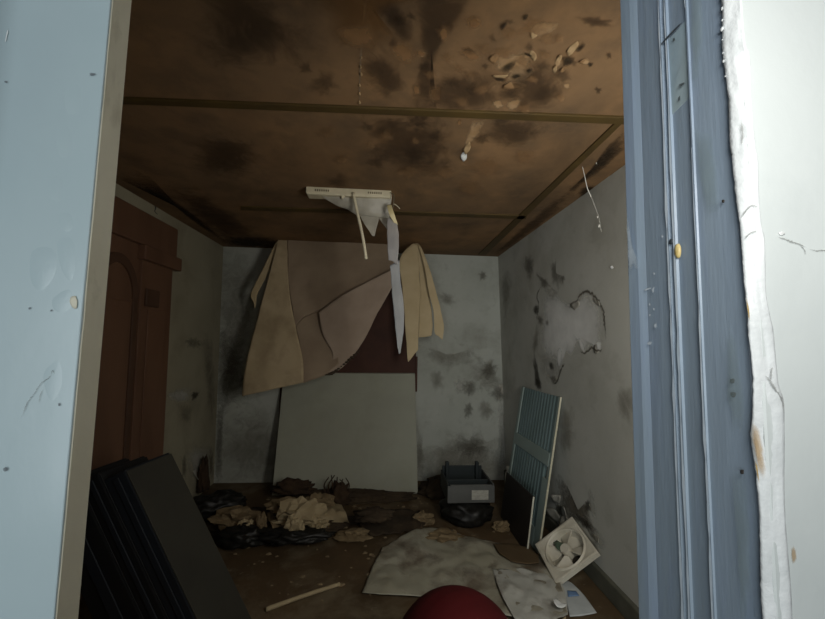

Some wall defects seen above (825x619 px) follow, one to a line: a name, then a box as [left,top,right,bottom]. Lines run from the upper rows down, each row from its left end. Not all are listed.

damp [423,16,448,80]
peeling [489,50,537,90]
peeling [552,41,593,73]
peeling [493,99,520,110]
damp [578,143,616,195]
damp [230,238,273,247]
peeling [537,289,606,384]